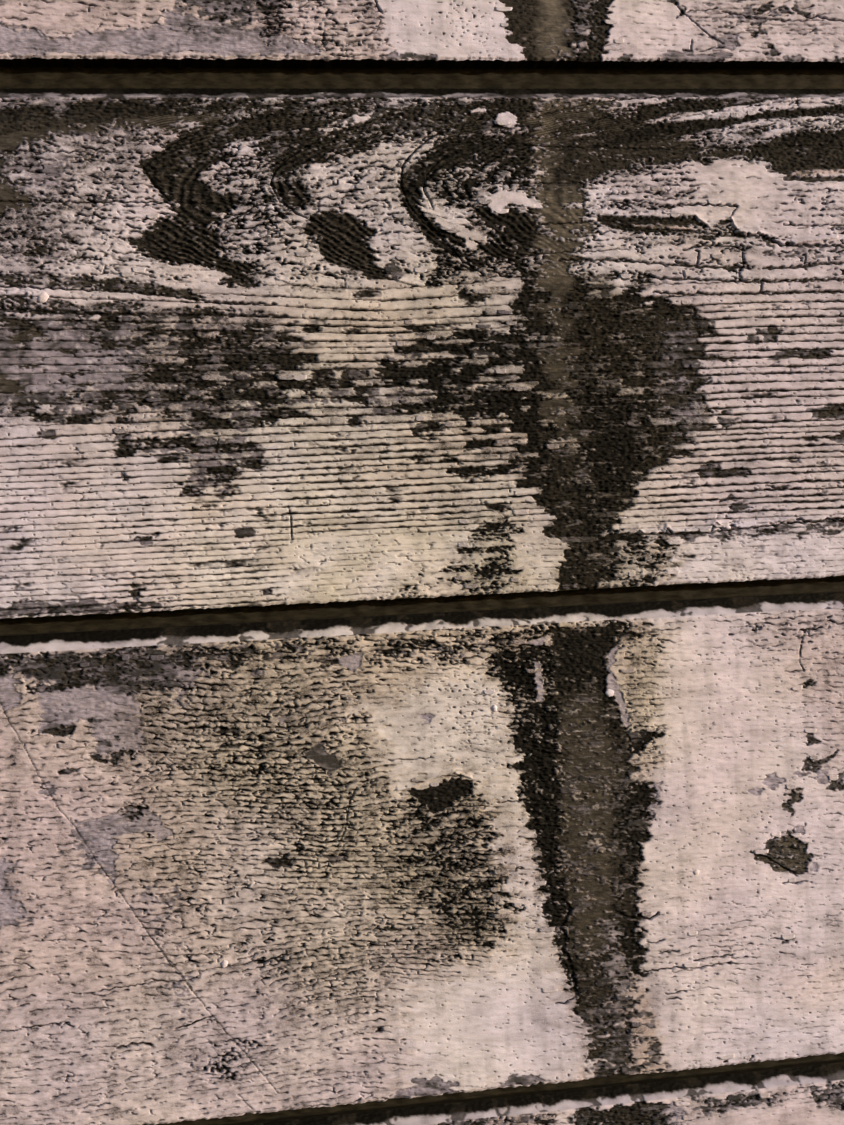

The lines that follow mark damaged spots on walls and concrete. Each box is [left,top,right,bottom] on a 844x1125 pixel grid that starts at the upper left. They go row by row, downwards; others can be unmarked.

spalling [801,729,844,791]
peeling [394,778,484,814]
spalling [782,784,804,815]
spalling [749,829,813,883]